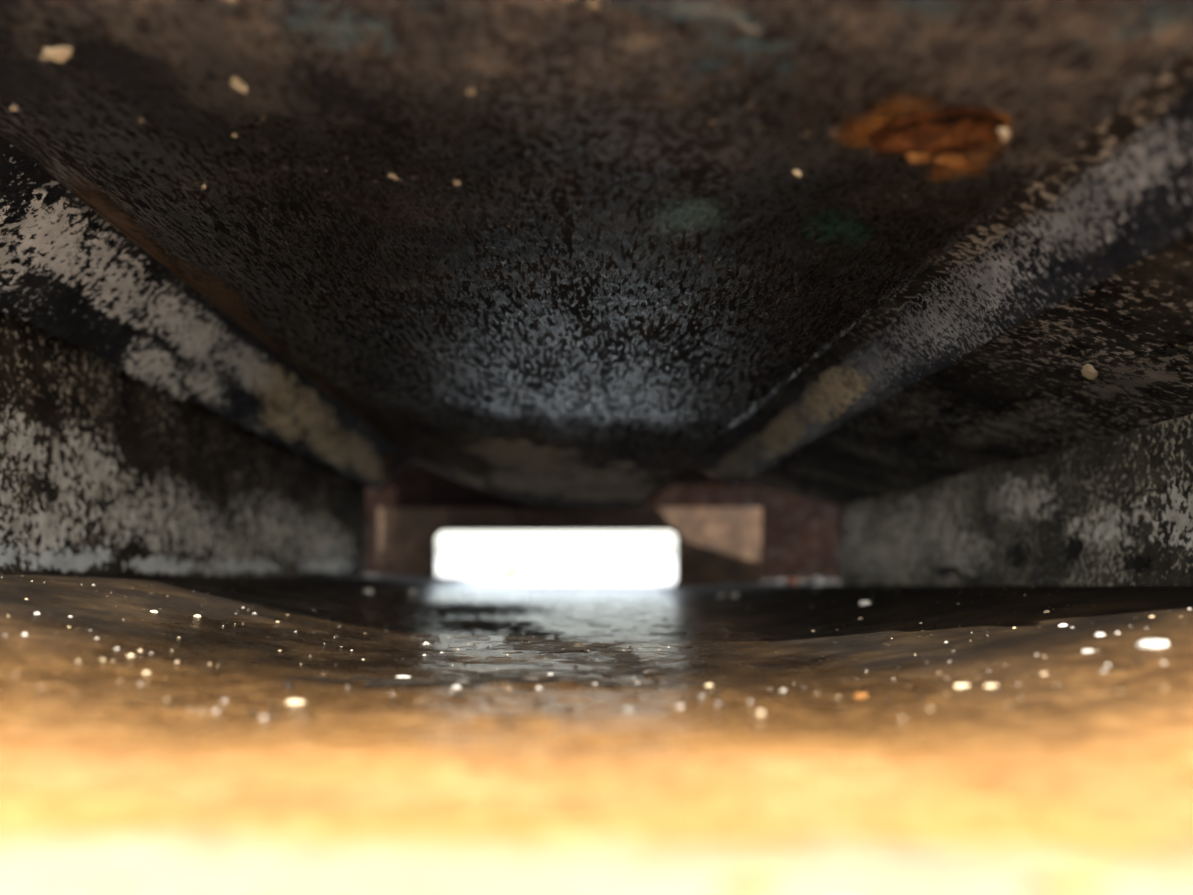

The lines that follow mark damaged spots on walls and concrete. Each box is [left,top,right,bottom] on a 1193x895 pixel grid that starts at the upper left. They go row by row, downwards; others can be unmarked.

leakage [0,189,389,484]
leakage [0,405,355,577]
leakage [836,485,995,579]
leakage [985,472,1193,556]